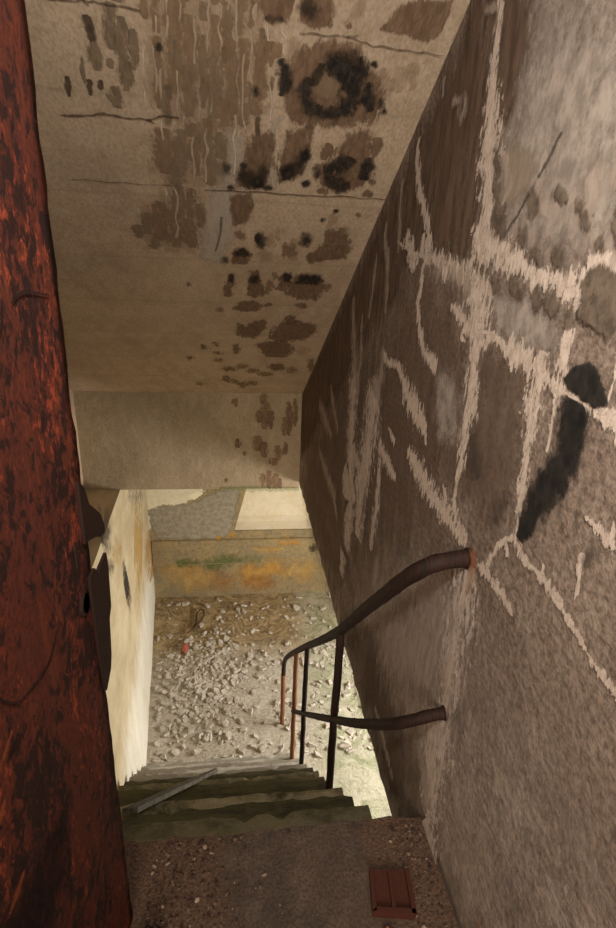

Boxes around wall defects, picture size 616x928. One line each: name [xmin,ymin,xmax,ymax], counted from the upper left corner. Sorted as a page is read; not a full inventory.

crack [63,0,140,11]
crack [301,32,442,56]
leakage [64,76,72,97]
crack [61,112,178,124]
leakage [80,0,387,388]
leakage [235,0,616,863]
peeling [128,489,239,540]
corrosion [134,517,318,593]
flaking render [123,566,131,604]